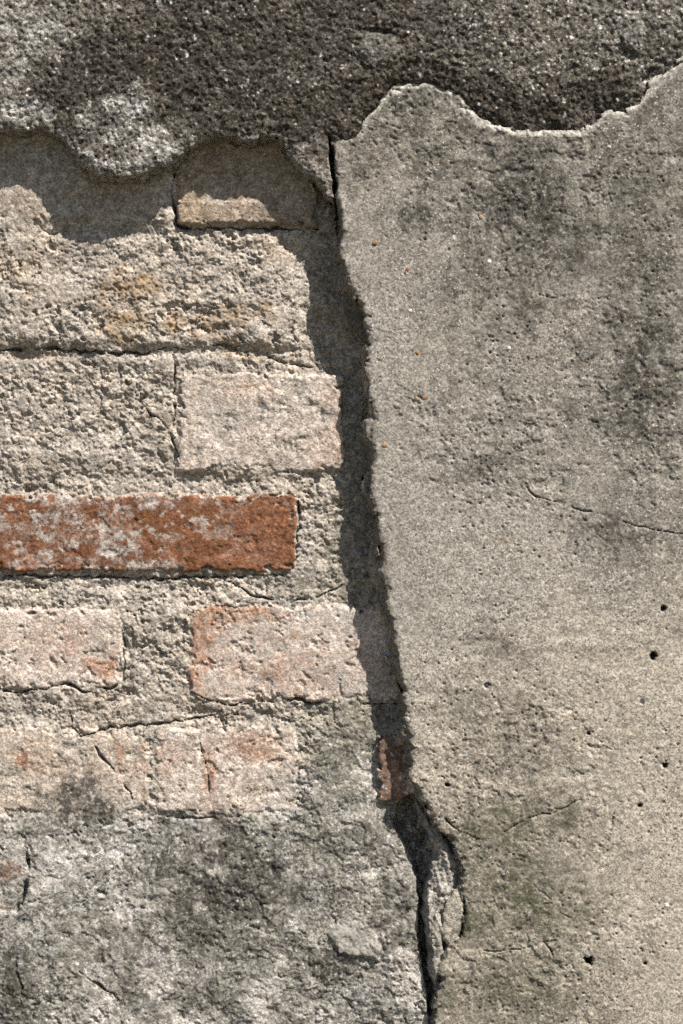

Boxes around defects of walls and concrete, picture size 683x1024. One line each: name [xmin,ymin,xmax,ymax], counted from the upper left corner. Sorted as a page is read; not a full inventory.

spalling [0,121,467,1024]